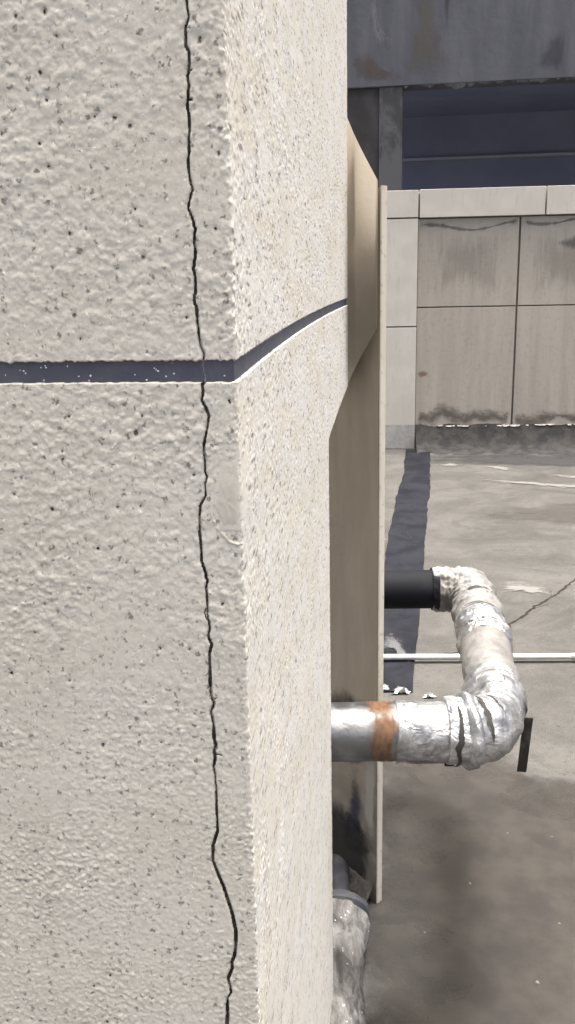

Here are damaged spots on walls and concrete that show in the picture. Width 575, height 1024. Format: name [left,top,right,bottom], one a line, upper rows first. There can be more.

leakage [419,408,575,425]
crack [184,0,238,1024]
crack [508,579,575,627]